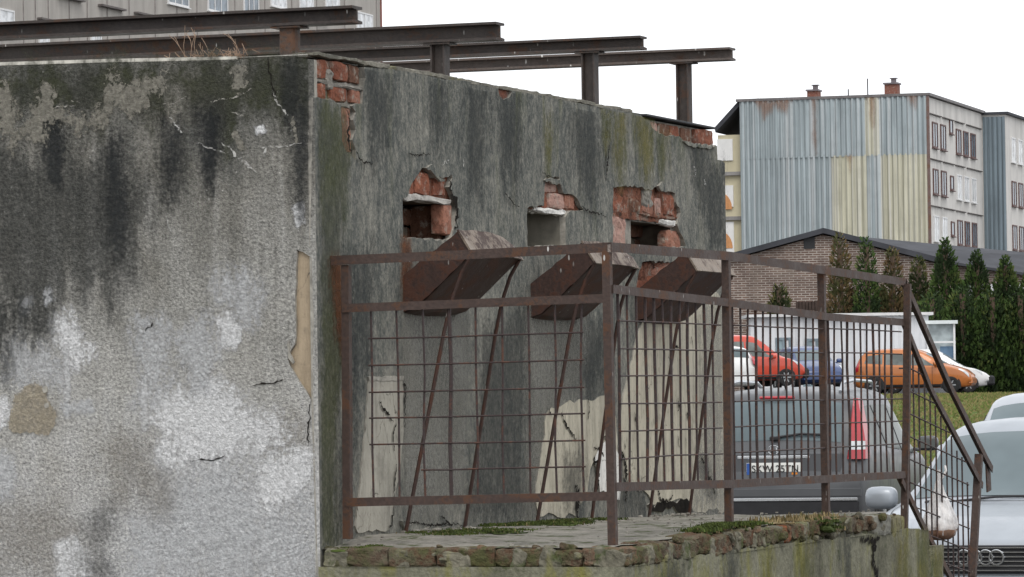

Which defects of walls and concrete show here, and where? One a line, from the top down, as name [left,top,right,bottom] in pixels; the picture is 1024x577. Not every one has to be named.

spalling [316,59,363,153]
spalling [650,122,717,149]
spalling [402,159,459,236]
spalling [528,178,579,217]
spalling [612,182,681,247]
damp [0,47,350,577]
spalling [287,250,311,397]
peeling [8,383,57,435]
peeling [354,311,470,533]
peeling [526,292,724,519]